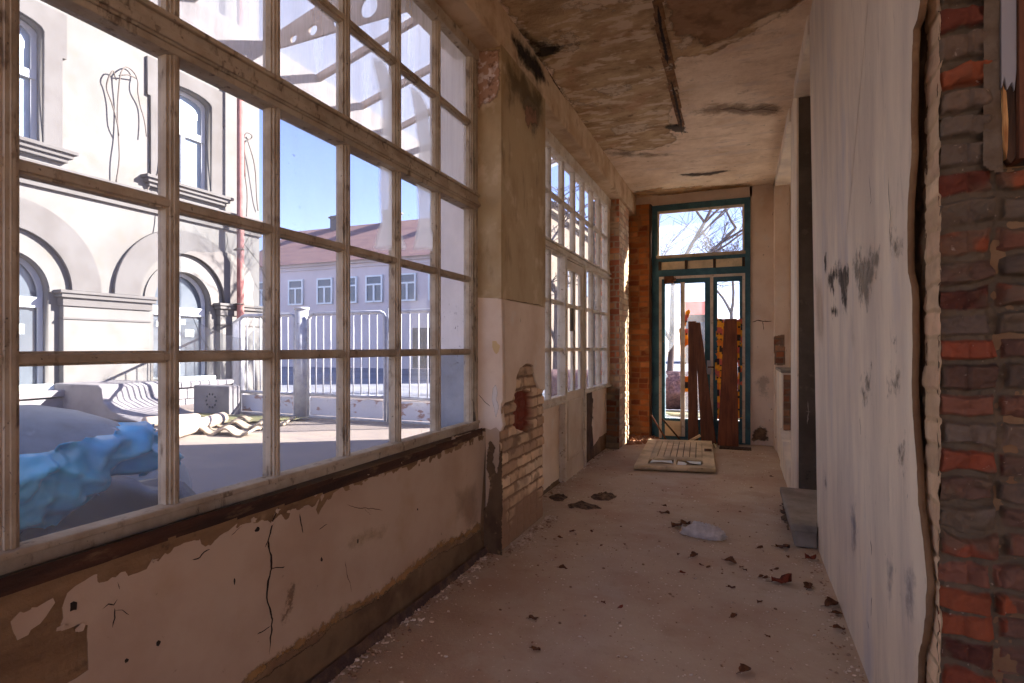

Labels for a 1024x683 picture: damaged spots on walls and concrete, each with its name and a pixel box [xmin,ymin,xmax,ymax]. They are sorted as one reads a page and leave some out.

water stain [478,29,563,129]
peeling [501,0,802,151]
water stain [824,251,878,319]
peeling [0,363,545,683]
crack [258,508,327,654]